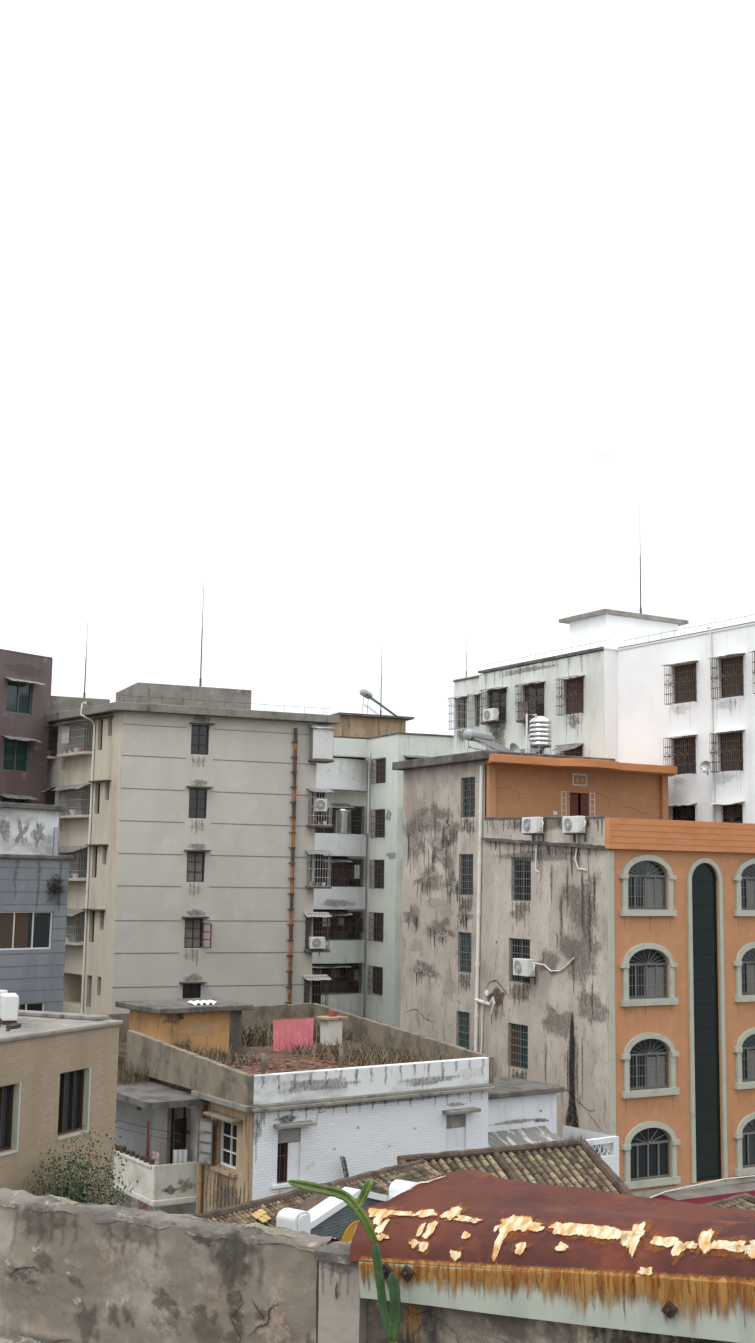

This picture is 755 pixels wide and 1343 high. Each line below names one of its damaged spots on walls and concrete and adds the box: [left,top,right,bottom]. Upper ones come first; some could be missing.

leakage [405,805,606,1128]
leakage [253,1063,483,1149]
leakage [193,1231,263,1290]
leakage [306,1260,349,1343]
corrosion [349,1169,755,1322]
peeling [365,1176,755,1277]
leakage [592,1326,715,1343]